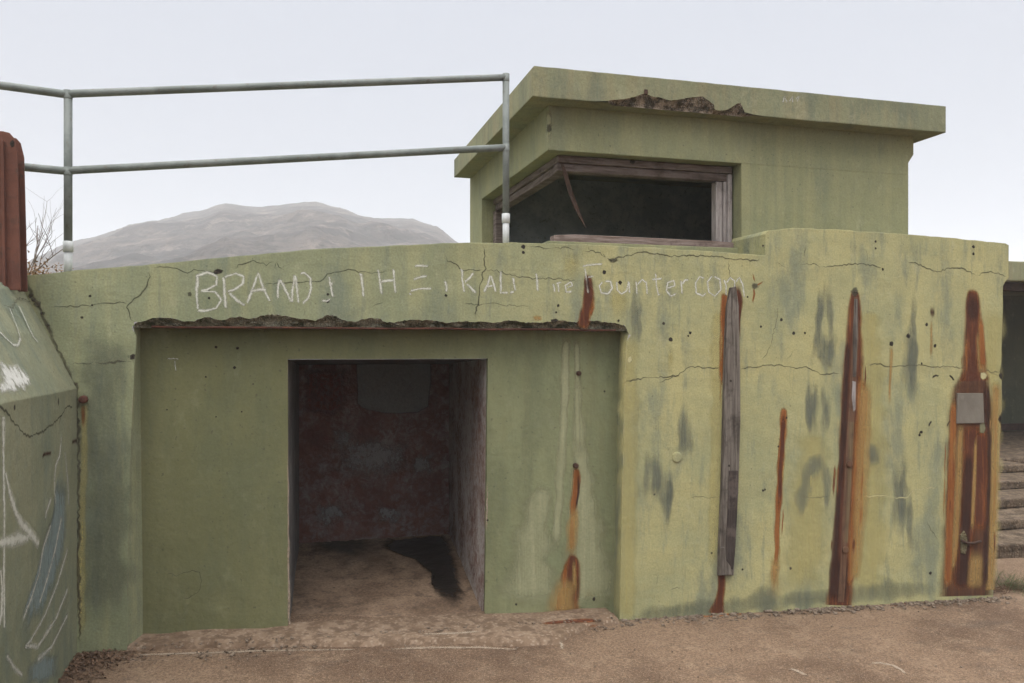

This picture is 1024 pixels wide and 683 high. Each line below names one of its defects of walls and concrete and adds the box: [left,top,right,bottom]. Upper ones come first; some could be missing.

spalling [608,89,753,117]
spalling [133,293,628,332]
crack [447,249,573,314]
rust [578,276,594,328]
crack [531,246,758,275]
crack [910,262,1004,276]
crack [630,366,715,382]
crack [0,266,210,633]
rust [828,292,870,609]
rust [943,290,995,597]
rust [771,409,787,585]
rust [545,469,595,626]